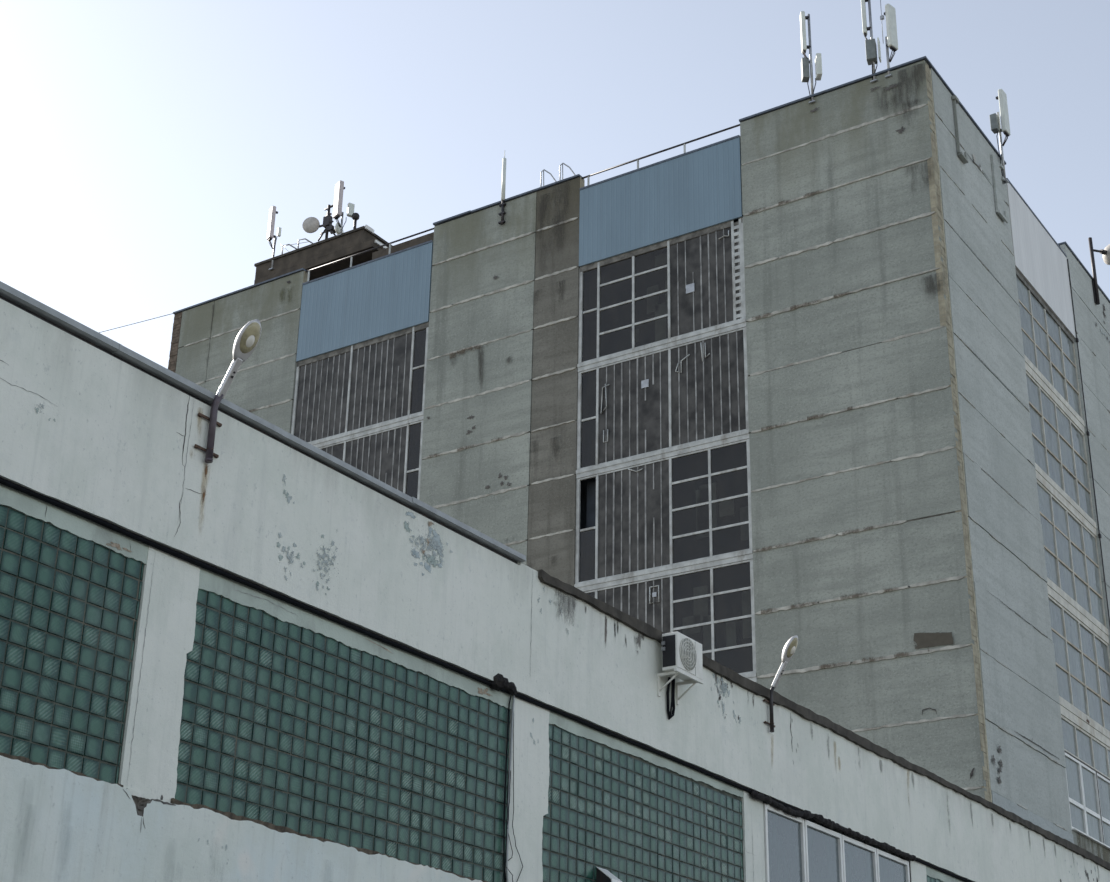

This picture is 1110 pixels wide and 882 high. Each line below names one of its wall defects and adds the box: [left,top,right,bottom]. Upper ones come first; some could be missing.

crack [175,395,201,535]
peeling [277,530,338,594]
peeling [404,512,453,576]